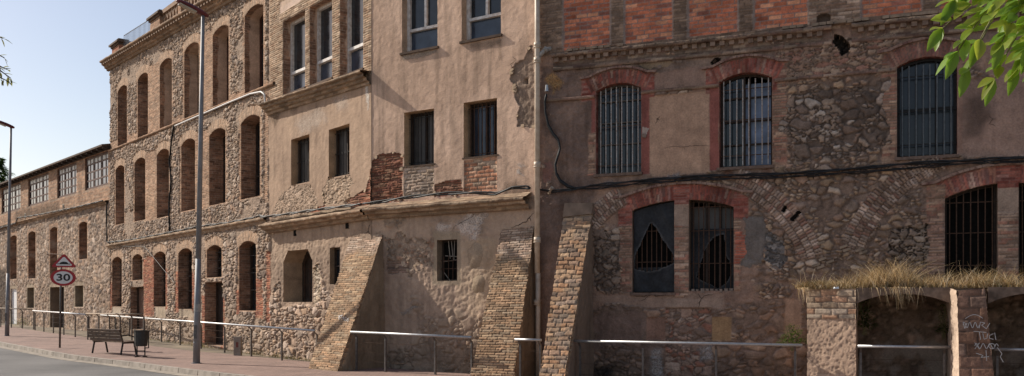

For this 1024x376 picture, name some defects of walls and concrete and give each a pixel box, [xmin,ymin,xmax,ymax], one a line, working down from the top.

spalling [833,34,850,56]
peeling [509,45,535,128]
flaking render [272,151,497,219]